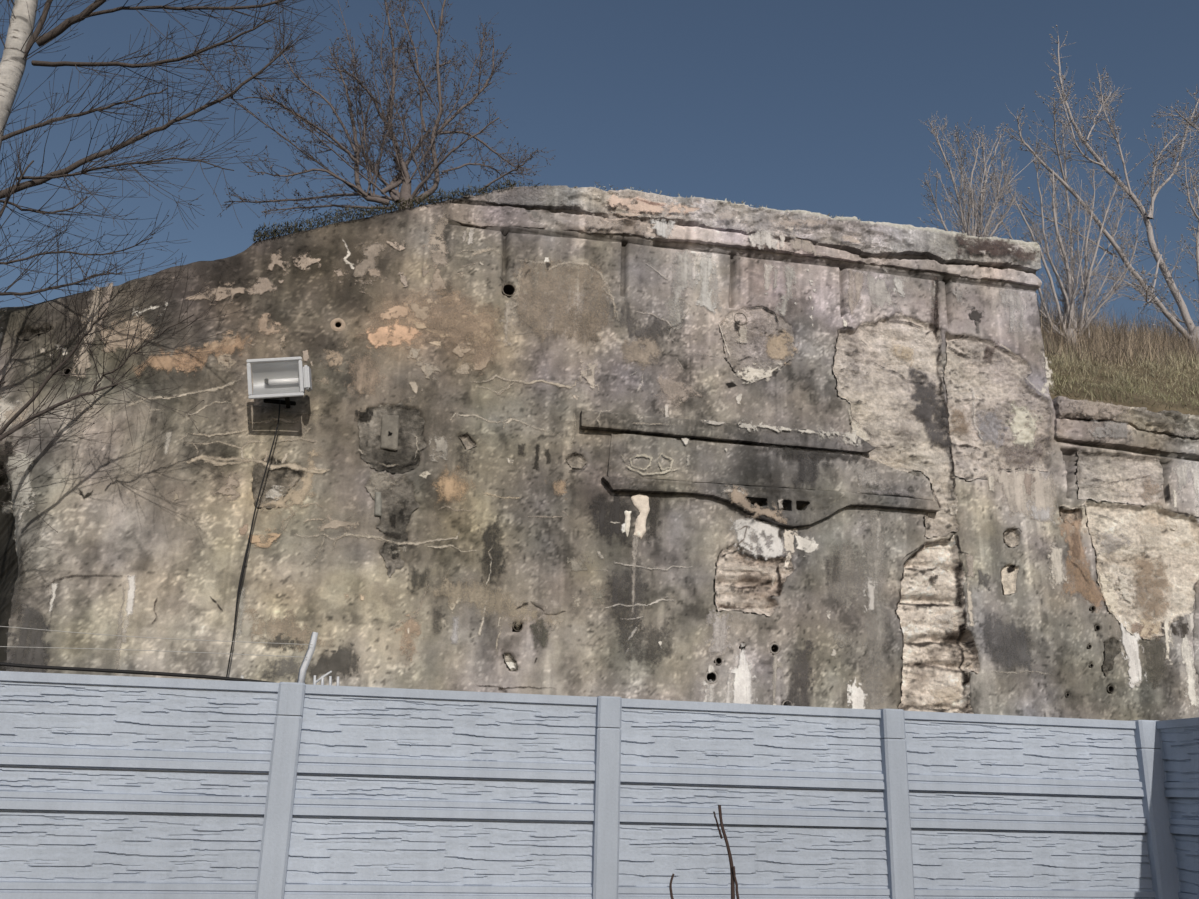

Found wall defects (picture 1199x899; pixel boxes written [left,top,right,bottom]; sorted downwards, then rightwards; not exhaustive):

peeling [101,303,168,352]
peeling [186,254,321,301]
peeling [251,313,285,352]
spalling [212,450,359,548]
peeling [303,216,497,577]
damp [411,515,552,647]
damp [518,444,550,470]
damp [589,493,671,664]
spalling [704,278,1053,714]
crack [915,279,956,488]
crack [904,535,968,558]
spalling [1059,400,1199,677]